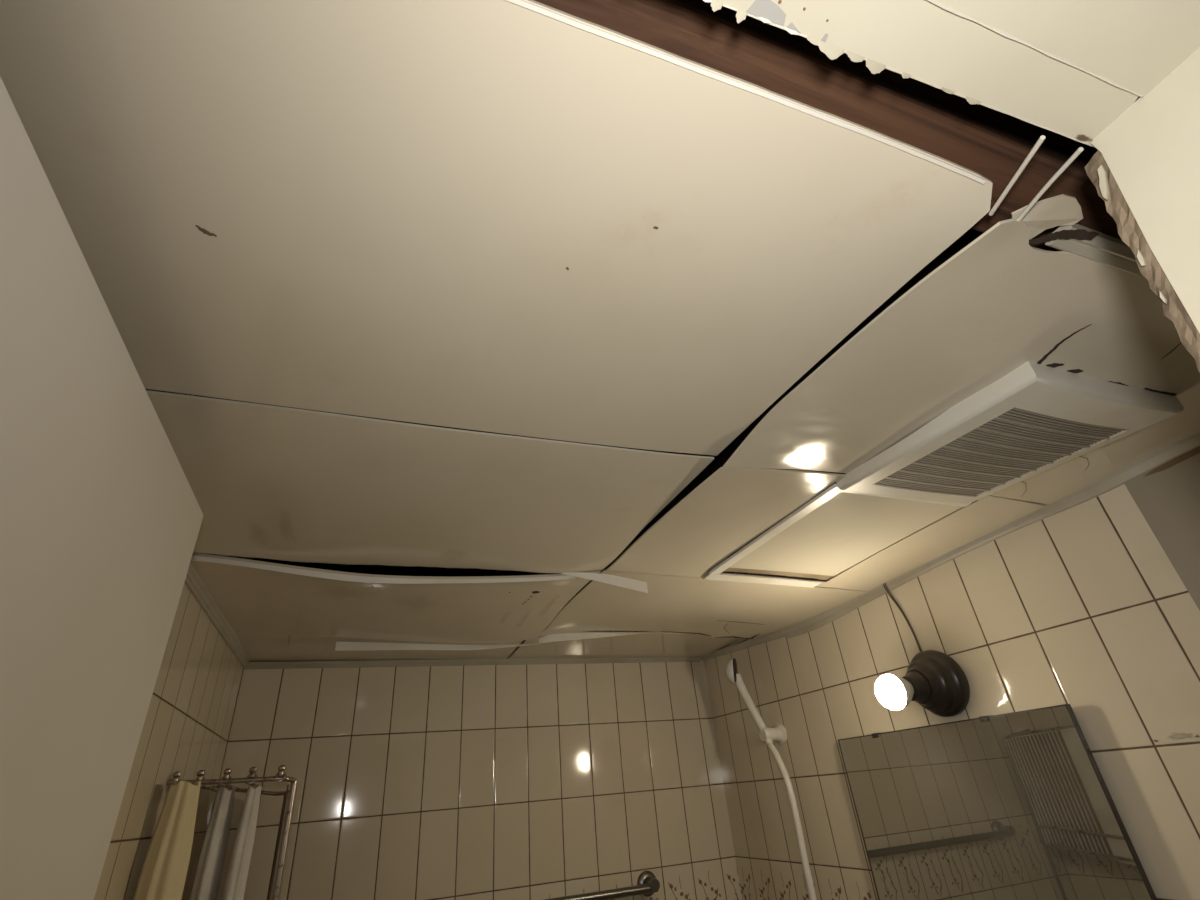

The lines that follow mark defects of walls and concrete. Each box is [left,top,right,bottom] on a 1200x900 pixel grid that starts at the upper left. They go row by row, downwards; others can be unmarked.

peeling [703,0,886,74]
peeling [941,87,981,104]
flaking render [1084,150,1200,372]